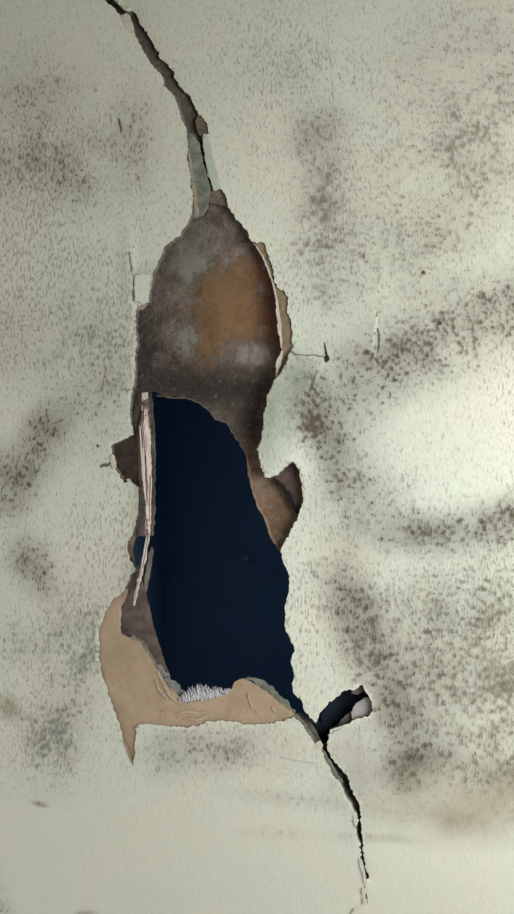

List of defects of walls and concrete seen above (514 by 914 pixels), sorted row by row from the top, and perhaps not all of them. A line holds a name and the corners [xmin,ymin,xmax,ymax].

mould [0,116,74,182]
crack [106,0,221,218]
mould [425,73,514,205]
mould [299,162,356,309]
mould [1,409,65,516]
peeling [99,187,305,763]
mould [289,277,514,551]
mould [11,537,52,591]
mould [26,610,100,769]
mould [325,566,514,791]
crack [281,713,369,914]